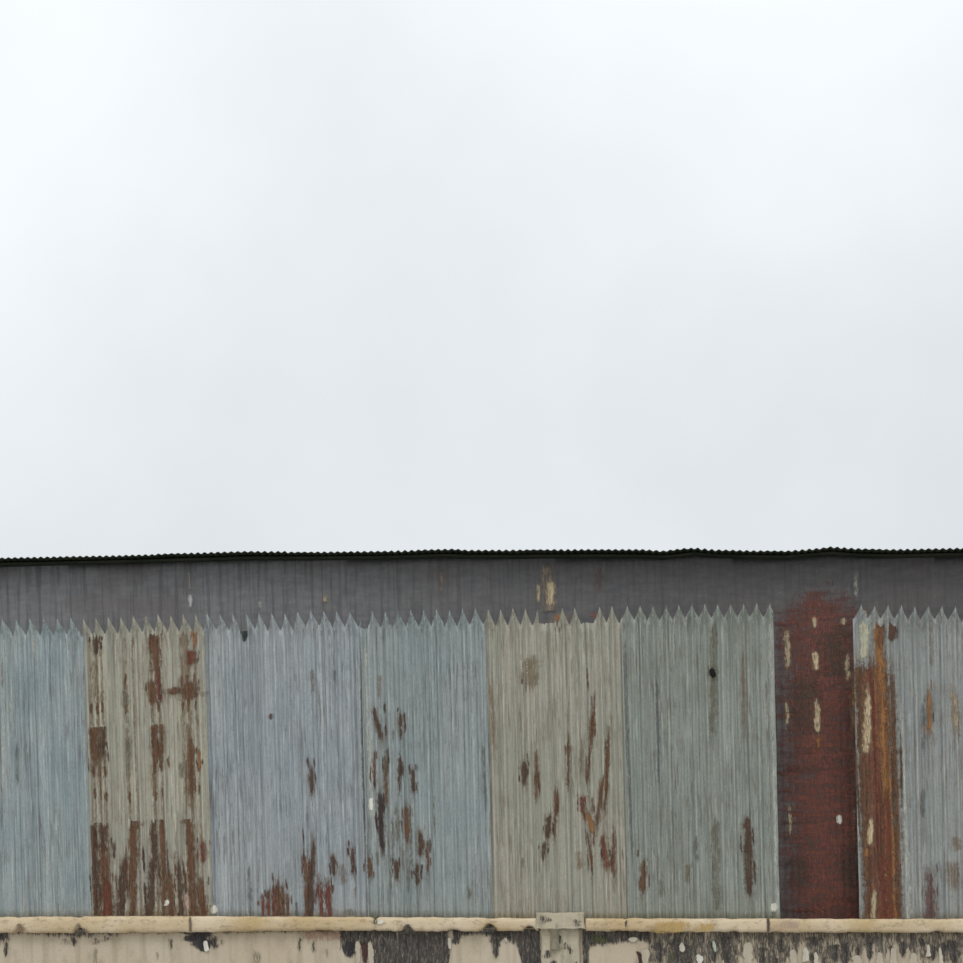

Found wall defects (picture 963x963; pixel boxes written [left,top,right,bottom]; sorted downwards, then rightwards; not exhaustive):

rust [88,631,212,916]
rust [373,704,406,740]
rust [519,751,540,800]
rust [564,669,623,877]
rust [774,581,903,919]
rust [248,750,435,917]
rust [538,789,559,860]
rust [637,850,662,892]
rust [740,818,757,896]
peeling [0,924,24,957]
peeling [305,919,541,963]
peeling [582,929,963,963]